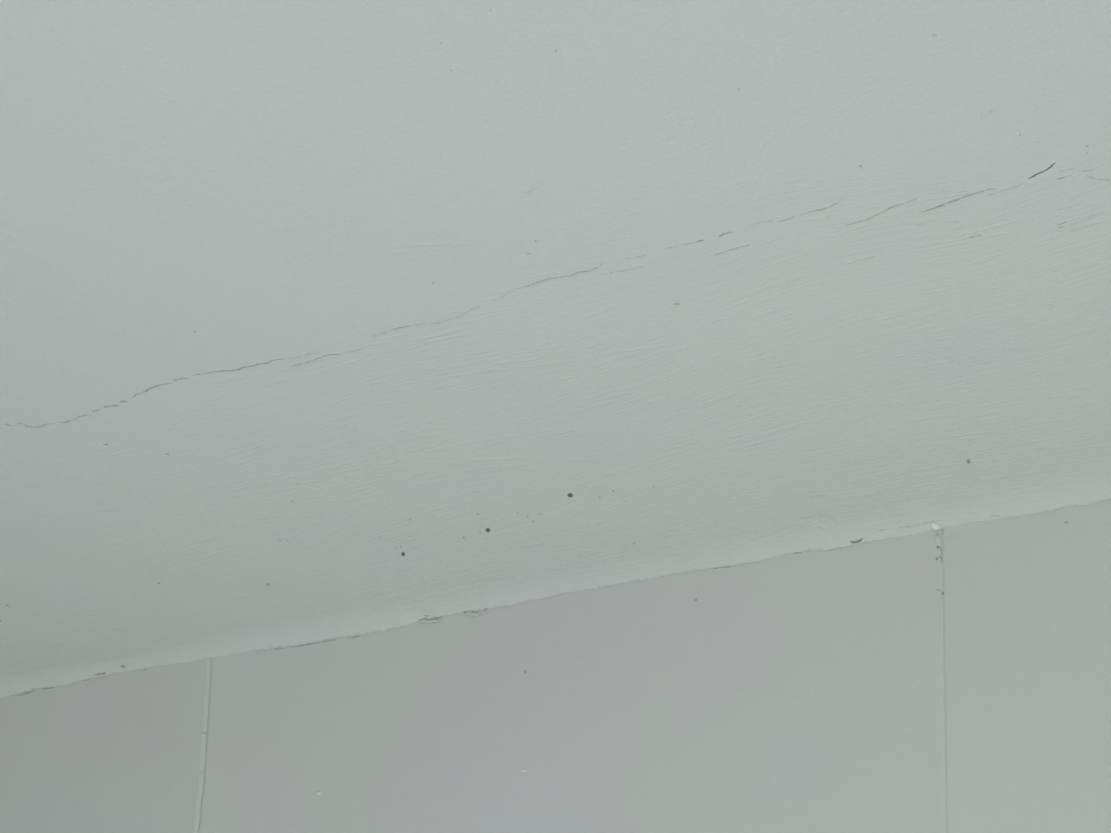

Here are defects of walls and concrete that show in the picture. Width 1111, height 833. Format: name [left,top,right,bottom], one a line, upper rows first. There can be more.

crack [0,162,1111,430]